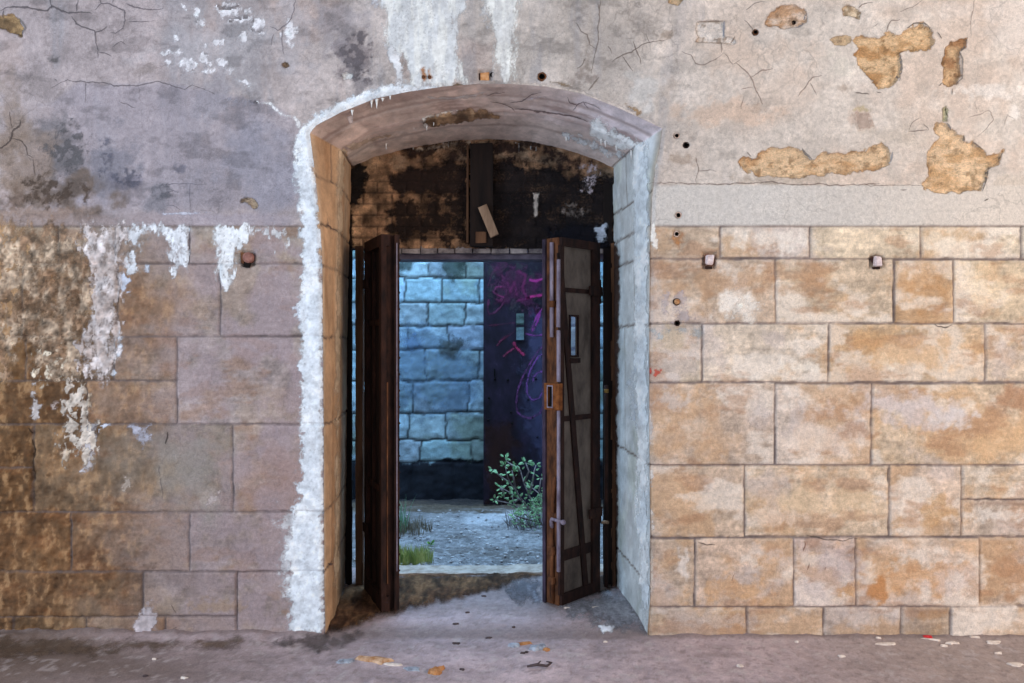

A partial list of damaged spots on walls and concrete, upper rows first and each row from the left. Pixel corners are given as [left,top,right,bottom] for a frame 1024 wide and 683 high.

flaking render [0,14,26,38]
crack [0,0,163,56]
damp [160,35,249,85]
crack [488,1,773,122]
flaking render [765,5,807,29]
flaking render [830,22,967,93]
crack [55,79,212,108]
crack [0,112,35,173]
flaking render [738,143,893,179]
flaking render [922,106,1004,201]
damp [0,175,190,472]
damp [213,0,468,633]